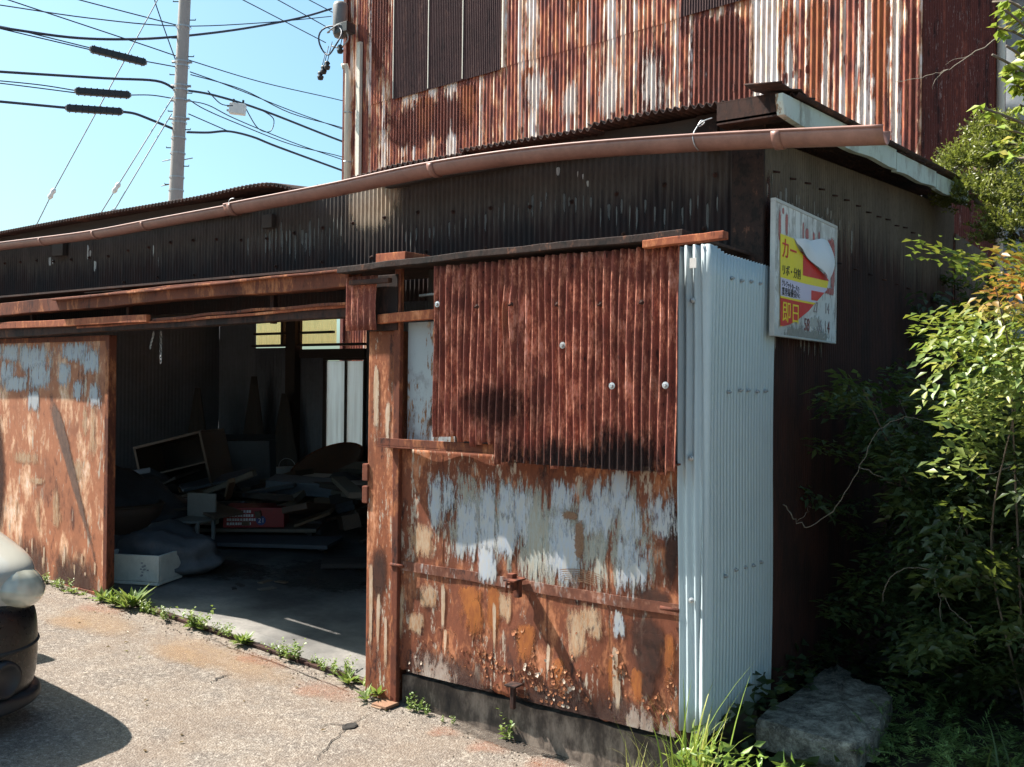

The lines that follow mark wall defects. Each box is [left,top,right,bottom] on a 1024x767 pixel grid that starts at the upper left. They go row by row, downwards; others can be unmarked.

corrosion [367,0,391,85]
corrosion [383,83,477,160]
corrosion [522,66,536,102]
corrosion [638,12,753,114]
peeling [0,341,100,455]
peeling [52,490,60,526]
corrosion [372,550,386,597]
peeling [400,584,437,634]
peeling [410,467,678,623]
corrosion [409,586,679,715]
peeling [566,608,625,659]